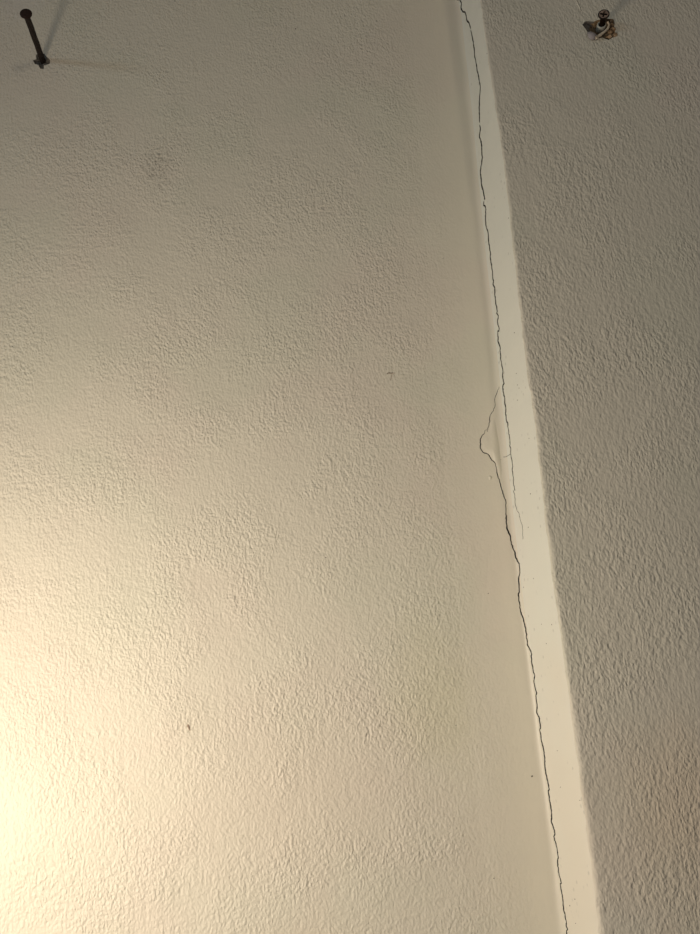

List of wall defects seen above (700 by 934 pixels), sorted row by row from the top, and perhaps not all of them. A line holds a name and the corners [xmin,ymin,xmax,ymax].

crack [460,0,568,934]